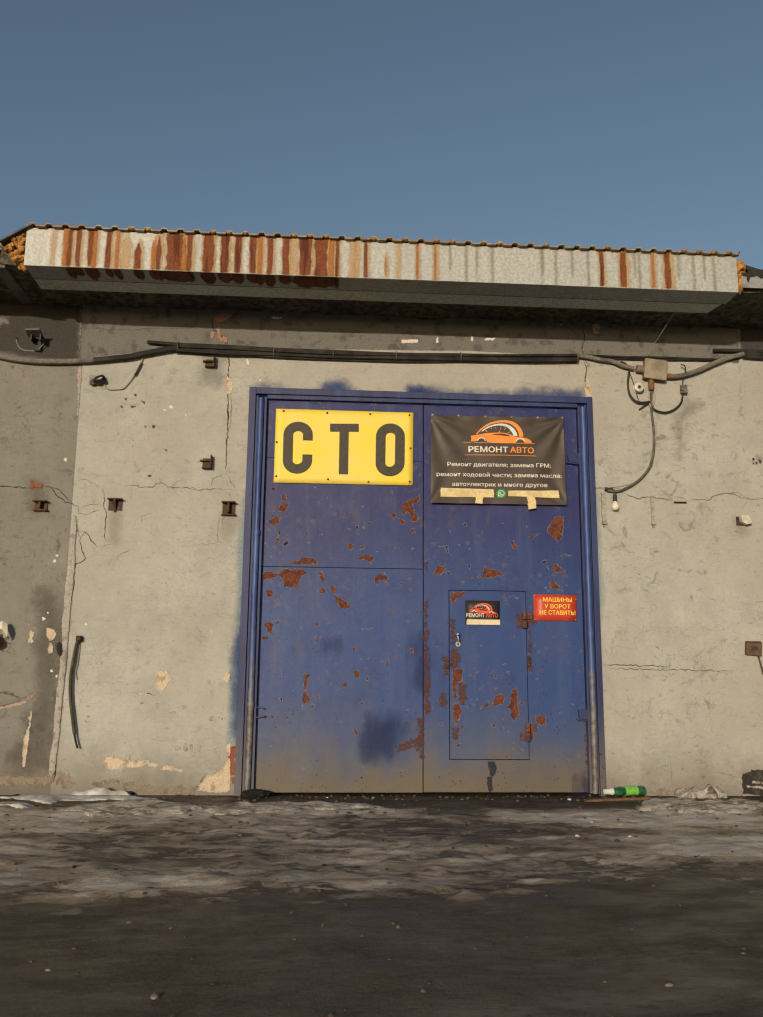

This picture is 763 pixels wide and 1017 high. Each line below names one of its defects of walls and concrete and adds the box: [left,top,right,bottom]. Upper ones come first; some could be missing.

corrosion [51,229,369,288]
corrosion [618,252,630,287]
corrosion [651,253,675,288]
crack [96,318,235,495]
crack [0,476,128,601]
corrosion [262,556,350,609]
corrosion [348,542,389,585]
corrosion [391,495,420,534]
peeling [42,612,56,653]
corrosion [301,673,311,704]
corrosion [395,601,467,759]
spalling [92,743,236,795]